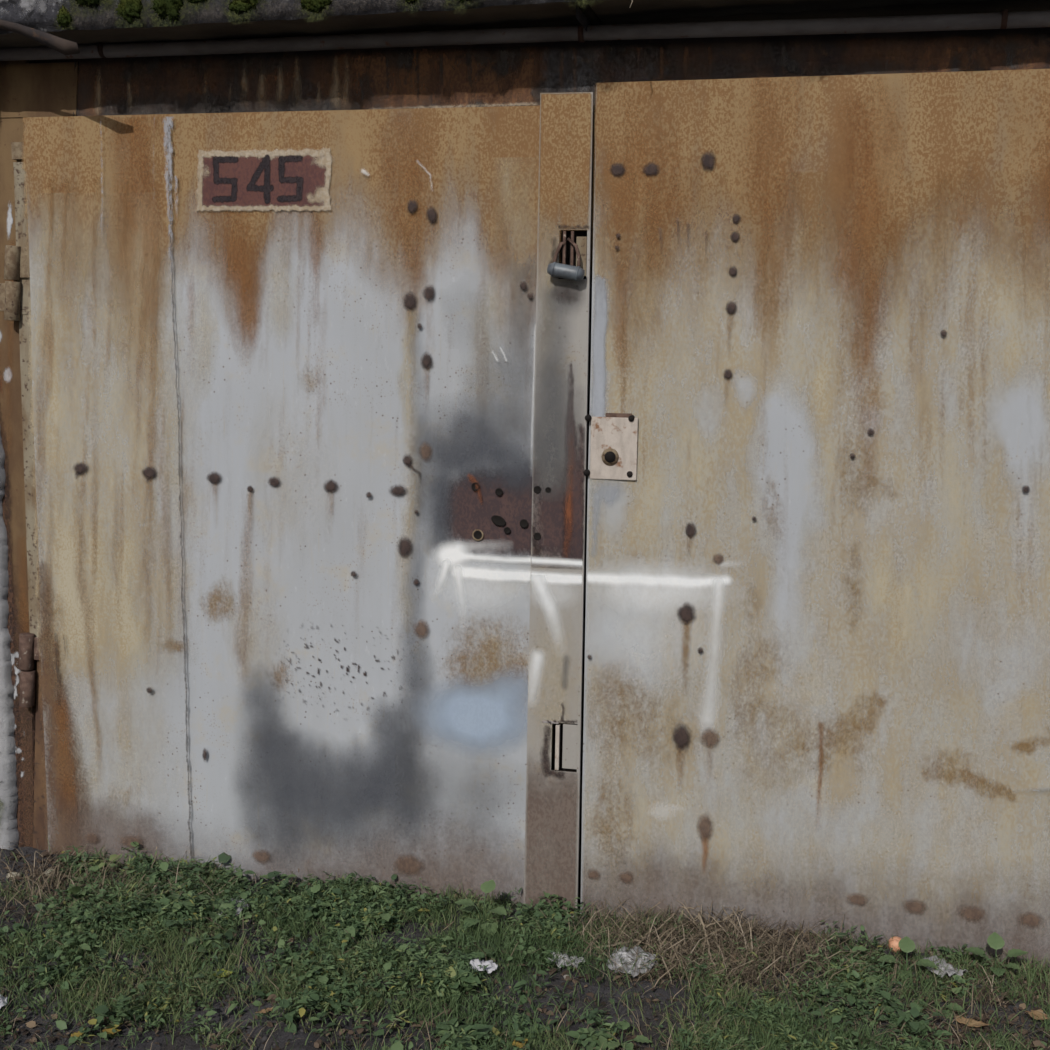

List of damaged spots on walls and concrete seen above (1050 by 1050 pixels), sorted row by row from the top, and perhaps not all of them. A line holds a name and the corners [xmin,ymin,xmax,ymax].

corrosion [5,46,1050,865]
corrosion [253,705,1050,970]